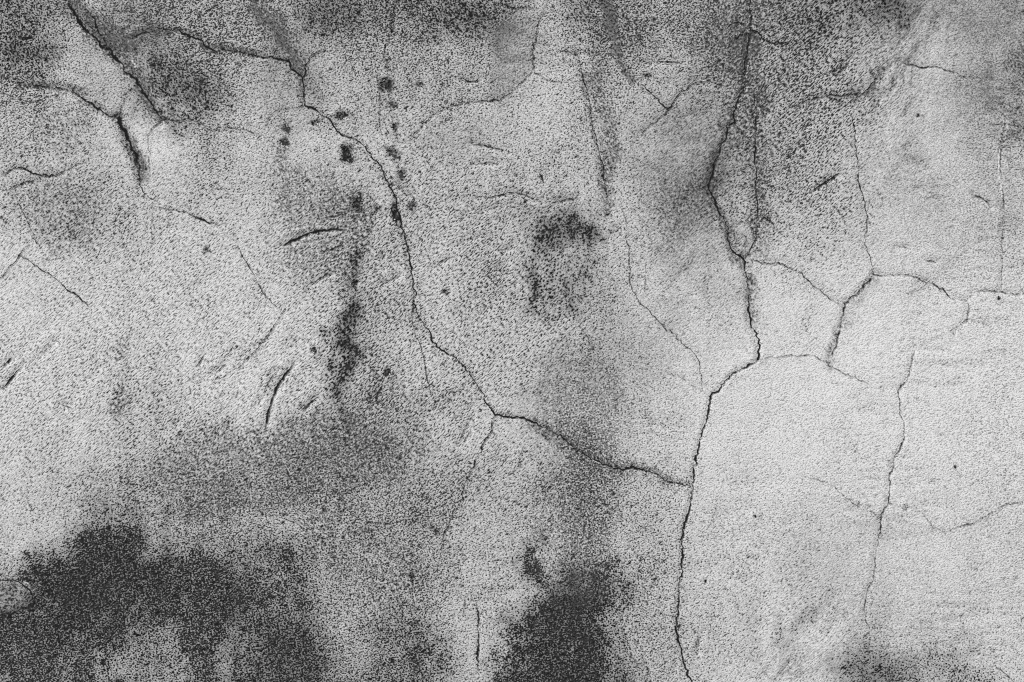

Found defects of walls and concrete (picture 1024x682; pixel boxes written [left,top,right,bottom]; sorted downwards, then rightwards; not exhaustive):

crack [2,163,88,306]
crack [27,1,259,224]
crack [130,0,863,682]
crack [849,112,872,263]
crack [831,274,955,355]
crack [802,62,988,103]
damp [0,397,465,682]
damp [479,376,643,682]
crack [802,354,914,640]